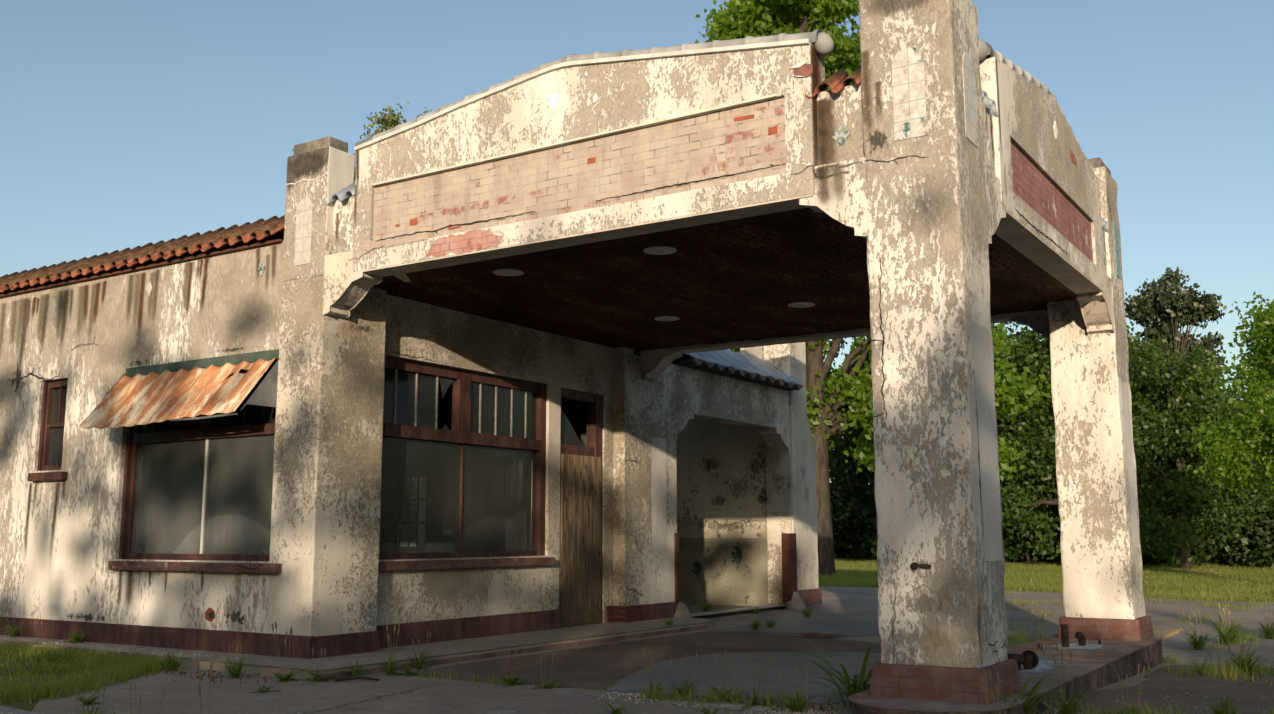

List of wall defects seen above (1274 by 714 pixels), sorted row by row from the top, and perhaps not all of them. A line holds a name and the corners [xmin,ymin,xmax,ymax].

crack [596,155,925,201]
damp [257,246,276,283]
spalling [362,217,502,257]
damp [128,270,159,329]
damp [11,290,73,392]
corrosion [79,356,277,429]